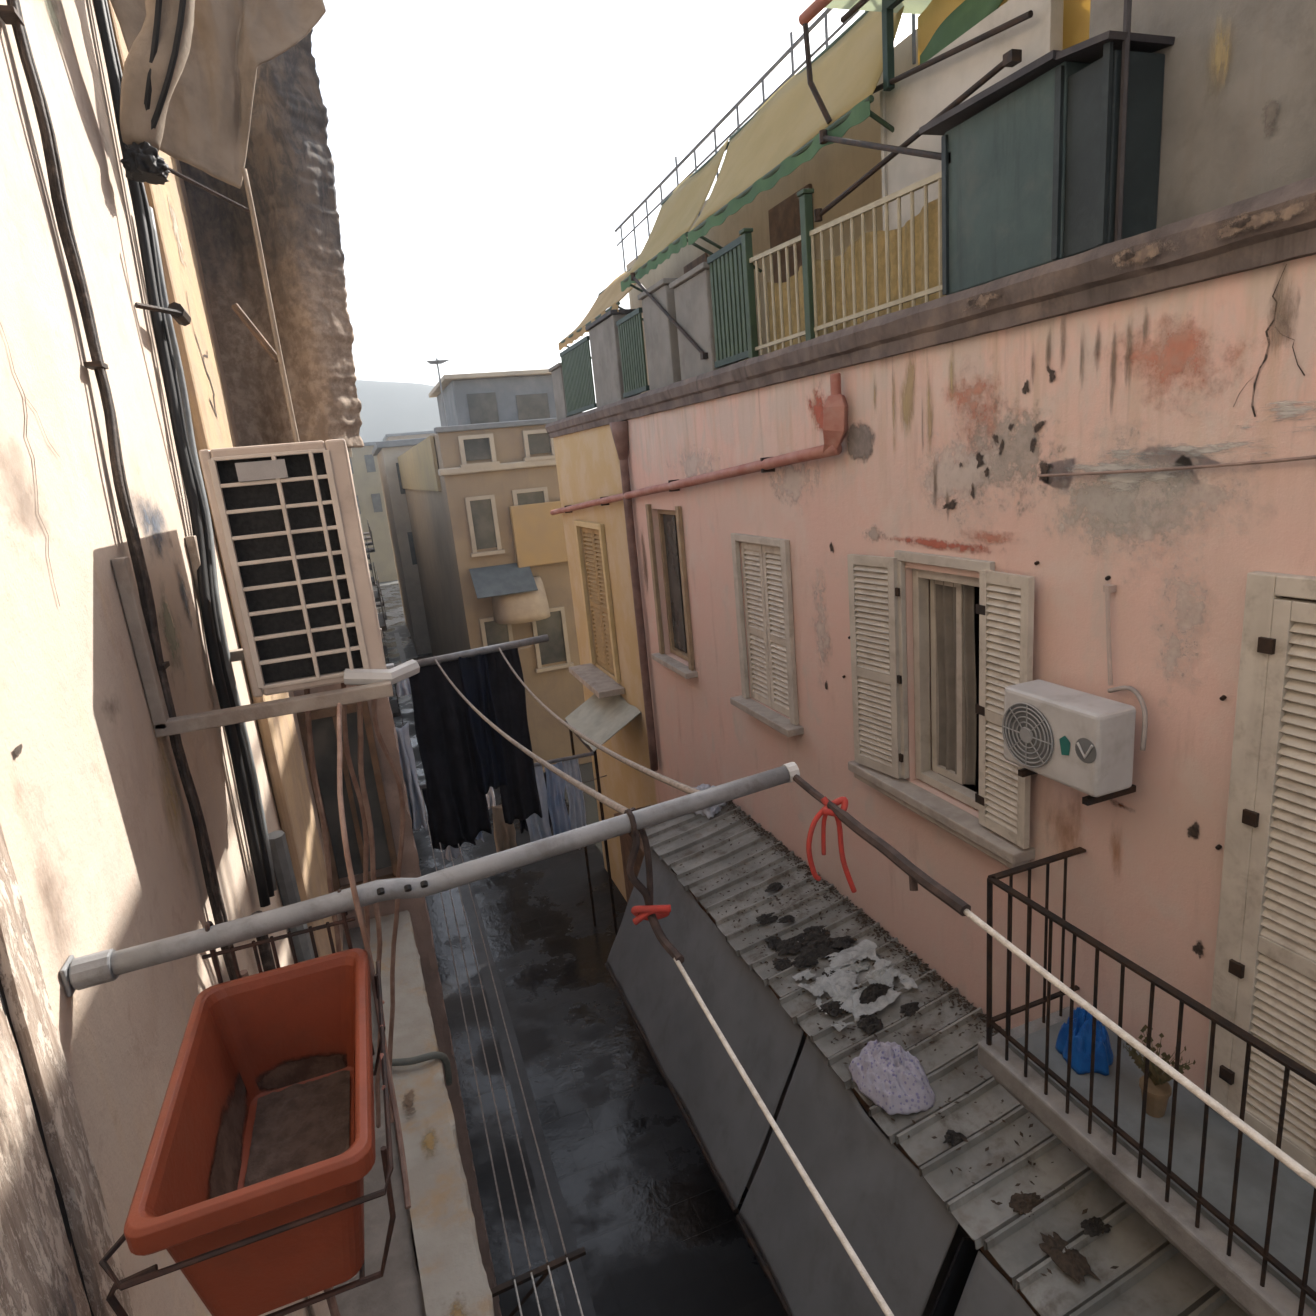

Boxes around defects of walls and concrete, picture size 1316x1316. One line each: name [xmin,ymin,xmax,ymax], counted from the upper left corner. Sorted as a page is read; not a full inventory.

spalling [1203,197,1316,238]
damp [1032,339,1064,376]
damp [1080,317,1147,402]
peeling [1129,328,1204,383]
crack [1234,264,1305,417]
crack [0,323,60,606]
peeling [926,380,1060,509]